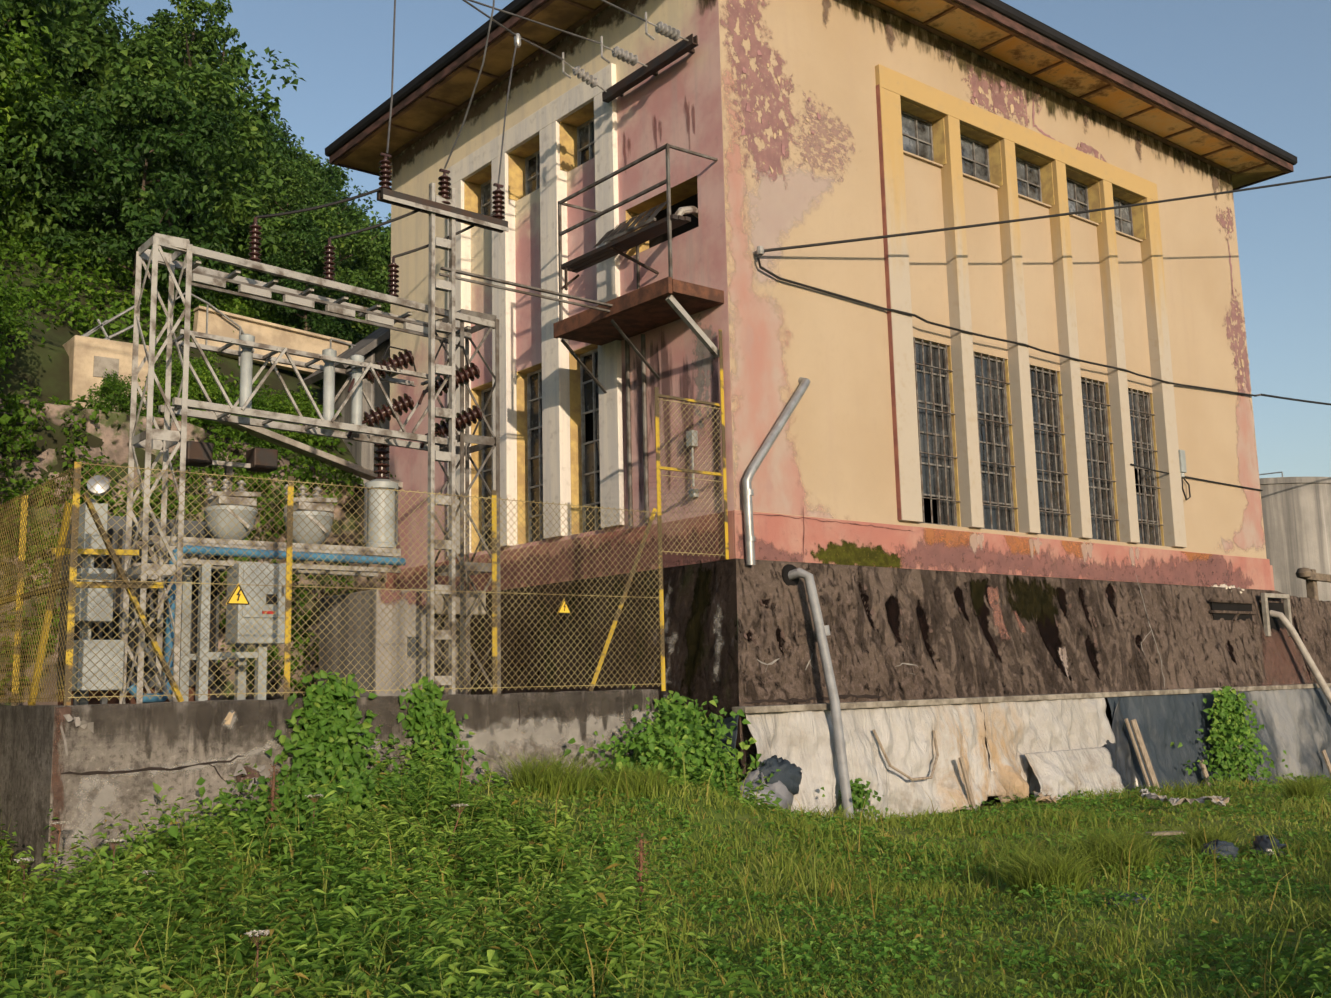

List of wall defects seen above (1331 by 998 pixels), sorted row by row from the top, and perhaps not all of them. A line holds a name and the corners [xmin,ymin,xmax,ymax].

leakage [392,0,647,177]
peeling [720,0,855,181]
spalling [964,66,1029,126]
leakage [822,0,1232,200]
peeling [1076,142,1106,162]
peeling [1216,208,1233,234]
peeling [1223,289,1251,396]
crack [60,722,243,781]